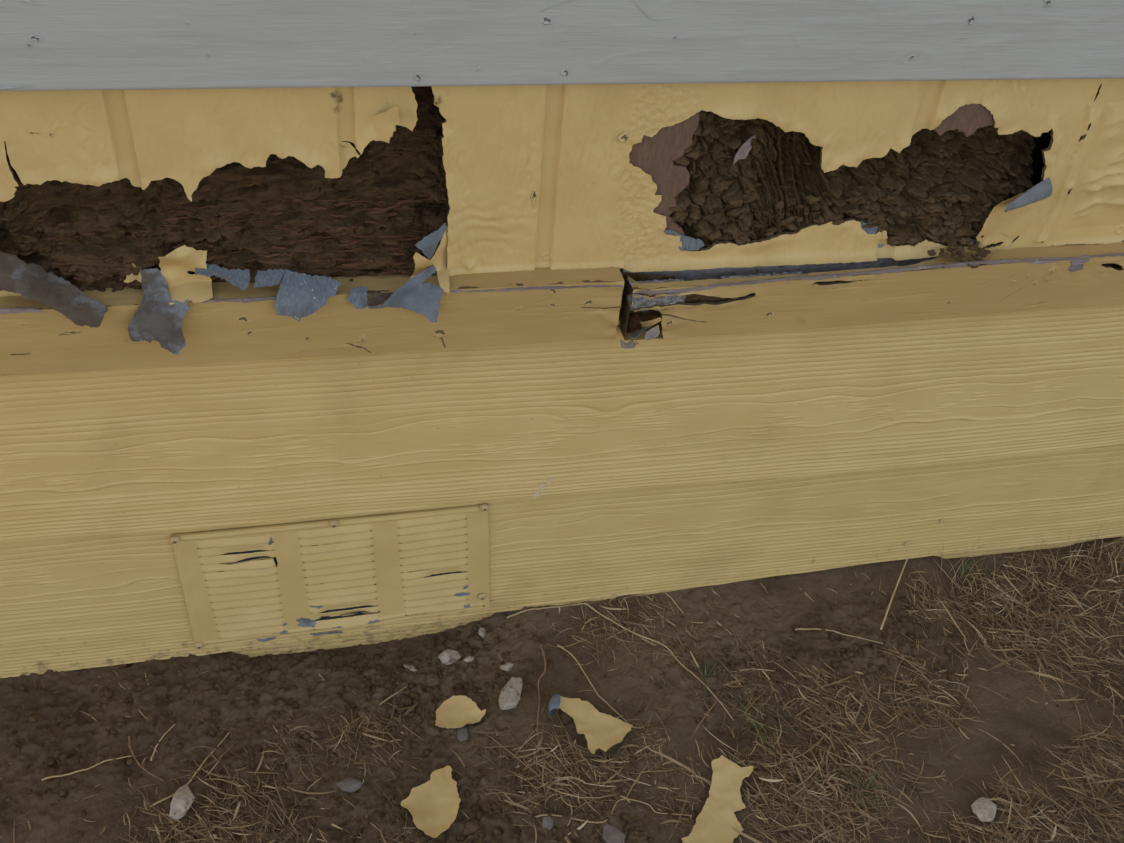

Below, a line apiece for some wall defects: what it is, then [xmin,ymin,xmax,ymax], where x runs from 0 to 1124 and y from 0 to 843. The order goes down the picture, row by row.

peeling [933,103,994,137]
peeling [617,112,700,236]
spalling [1010,130,1051,198]
peeling [449,242,1124,307]
peeling [201,296,277,336]